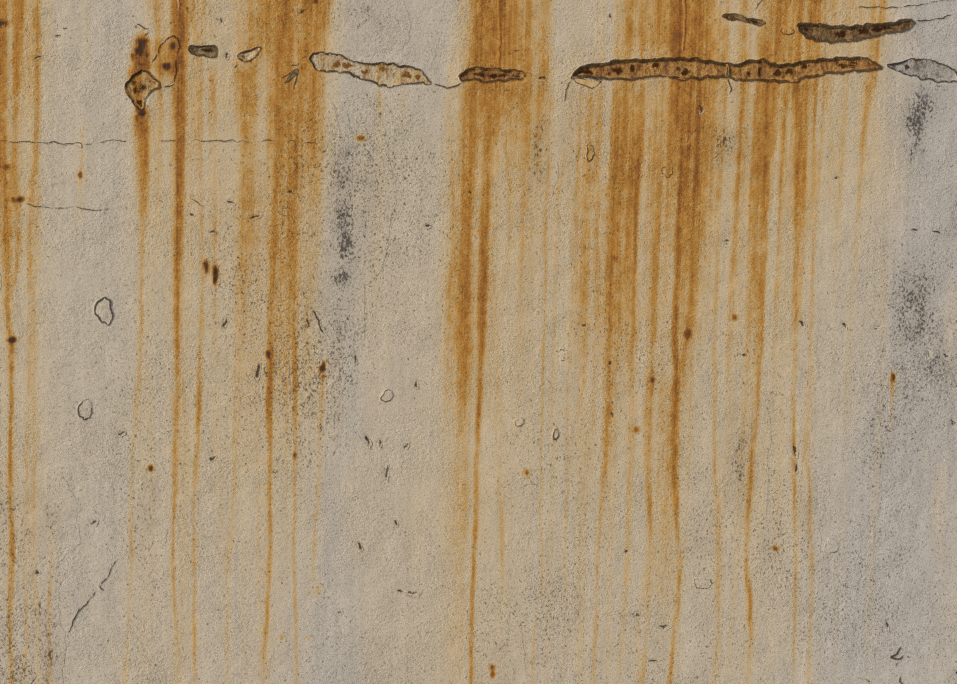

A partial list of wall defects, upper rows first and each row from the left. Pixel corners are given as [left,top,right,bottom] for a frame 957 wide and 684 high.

rust [0,0,58,483]
rust [4,541,57,672]
peeling [124,34,263,112]
rust [119,0,332,684]
peeling [281,50,548,91]
rust [446,0,558,684]
rust [557,78,735,684]
rust [617,0,891,684]
peeling [563,12,957,103]